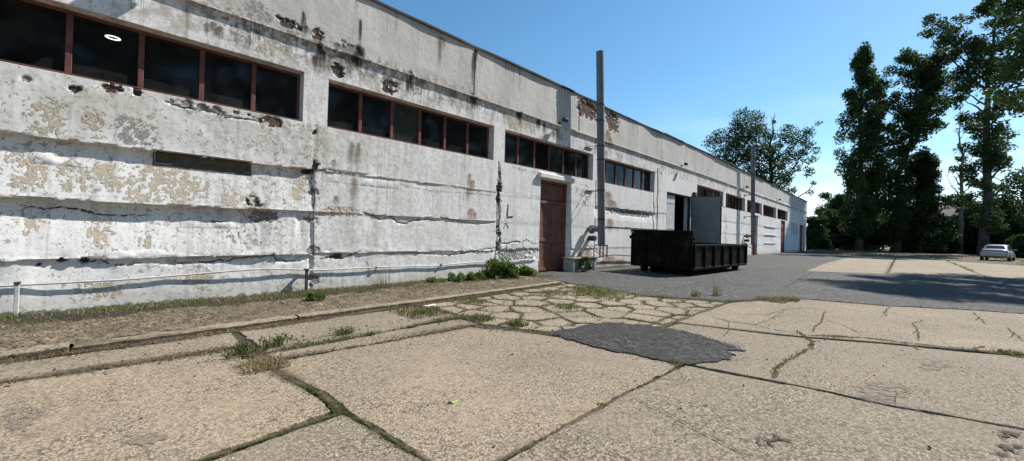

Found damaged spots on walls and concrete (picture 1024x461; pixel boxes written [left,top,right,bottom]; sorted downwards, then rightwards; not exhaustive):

spalling [243,0,364,78]
spalling [576,98,619,133]
crack [23,206,146,216]
spalling [0,86,283,245]
peeling [293,160,319,200]
crack [88,150,535,277]
crack [714,271,947,377]
crack [972,313,1023,358]